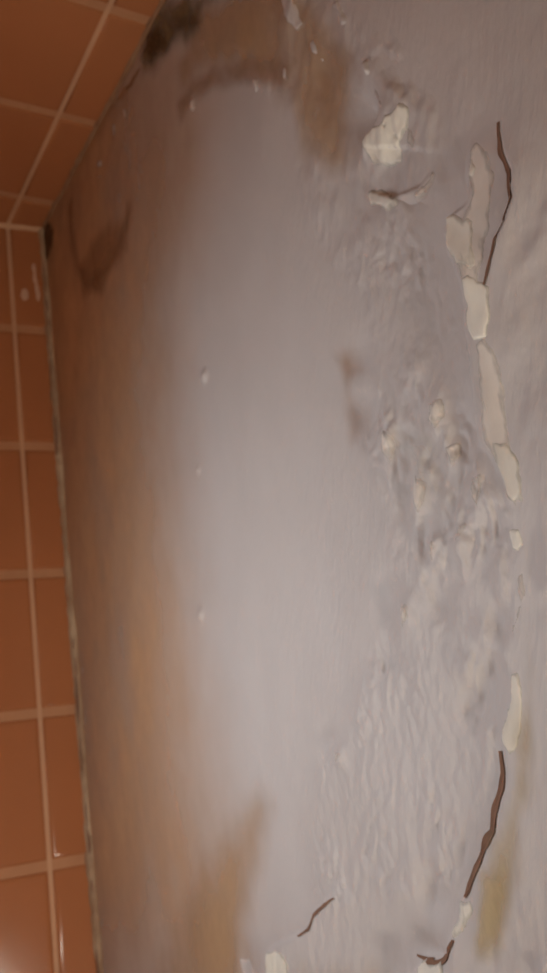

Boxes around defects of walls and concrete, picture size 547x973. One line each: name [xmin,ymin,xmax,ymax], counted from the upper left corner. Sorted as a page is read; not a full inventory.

water stain [142,0,200,66]
crack [483,122,510,285]
peeling [232,4,547,973]